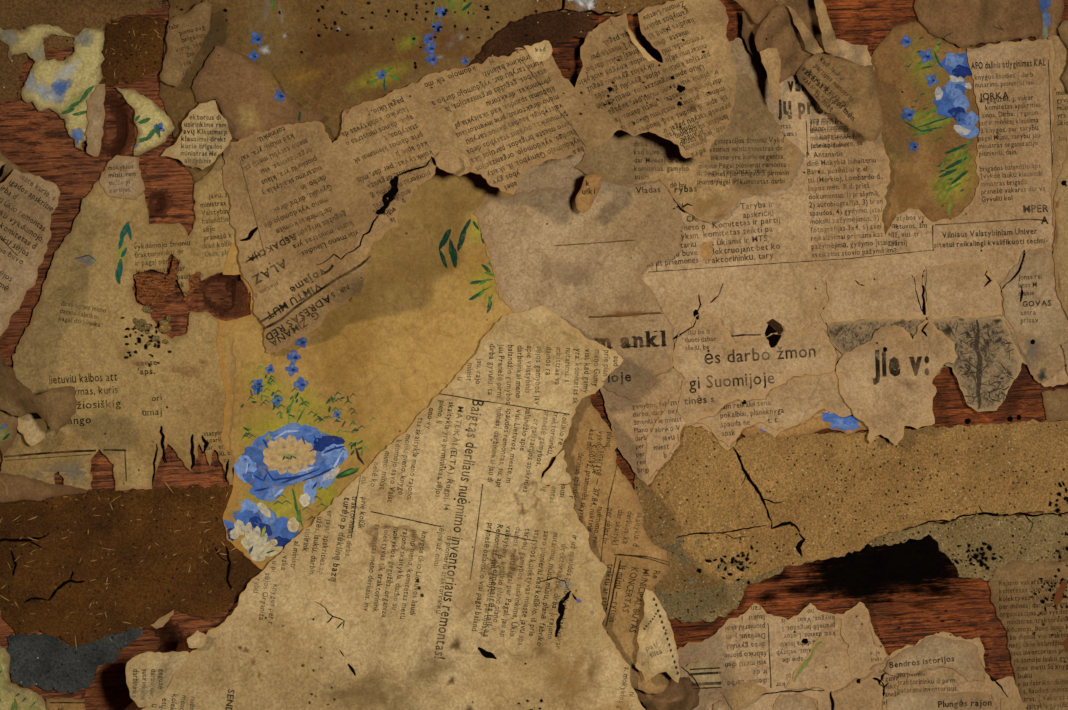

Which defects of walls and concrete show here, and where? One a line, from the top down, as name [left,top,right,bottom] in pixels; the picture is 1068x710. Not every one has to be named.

peeling [85,84,145,199]
peeling [575,172,602,213]
crack [676,447,806,556]
crack [903,506,1068,531]